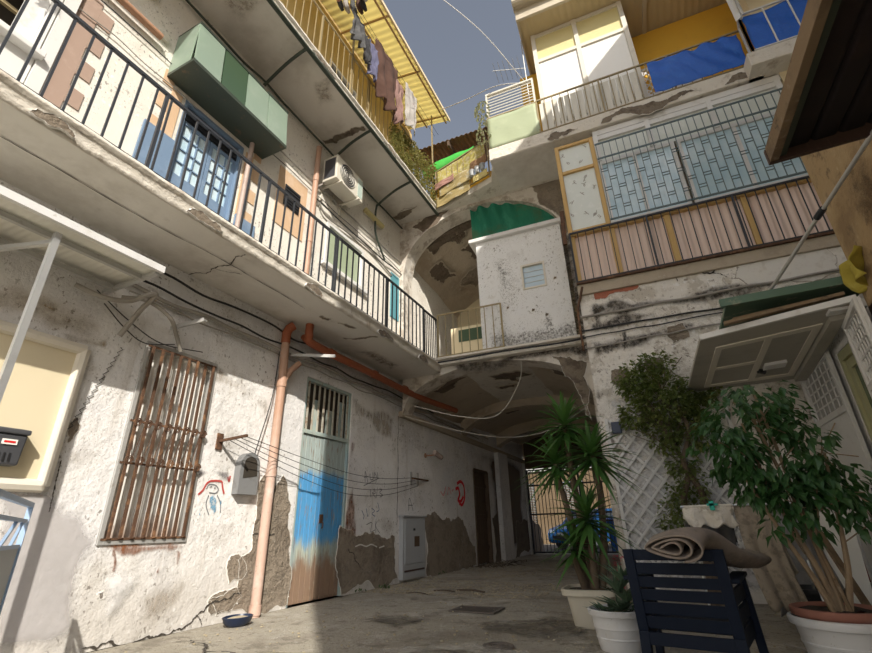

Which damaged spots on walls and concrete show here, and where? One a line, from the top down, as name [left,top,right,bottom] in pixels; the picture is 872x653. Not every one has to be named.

spalling [28,108,76,140]
spalling [601,89,700,124]
crack [0,136,302,307]
spalling [186,208,223,233]
spalling [393,206,417,220]
flaking render [412,210,478,287]
crack [49,461,61,512]
spalling [207,474,265,617]
crack [82,592,241,653]